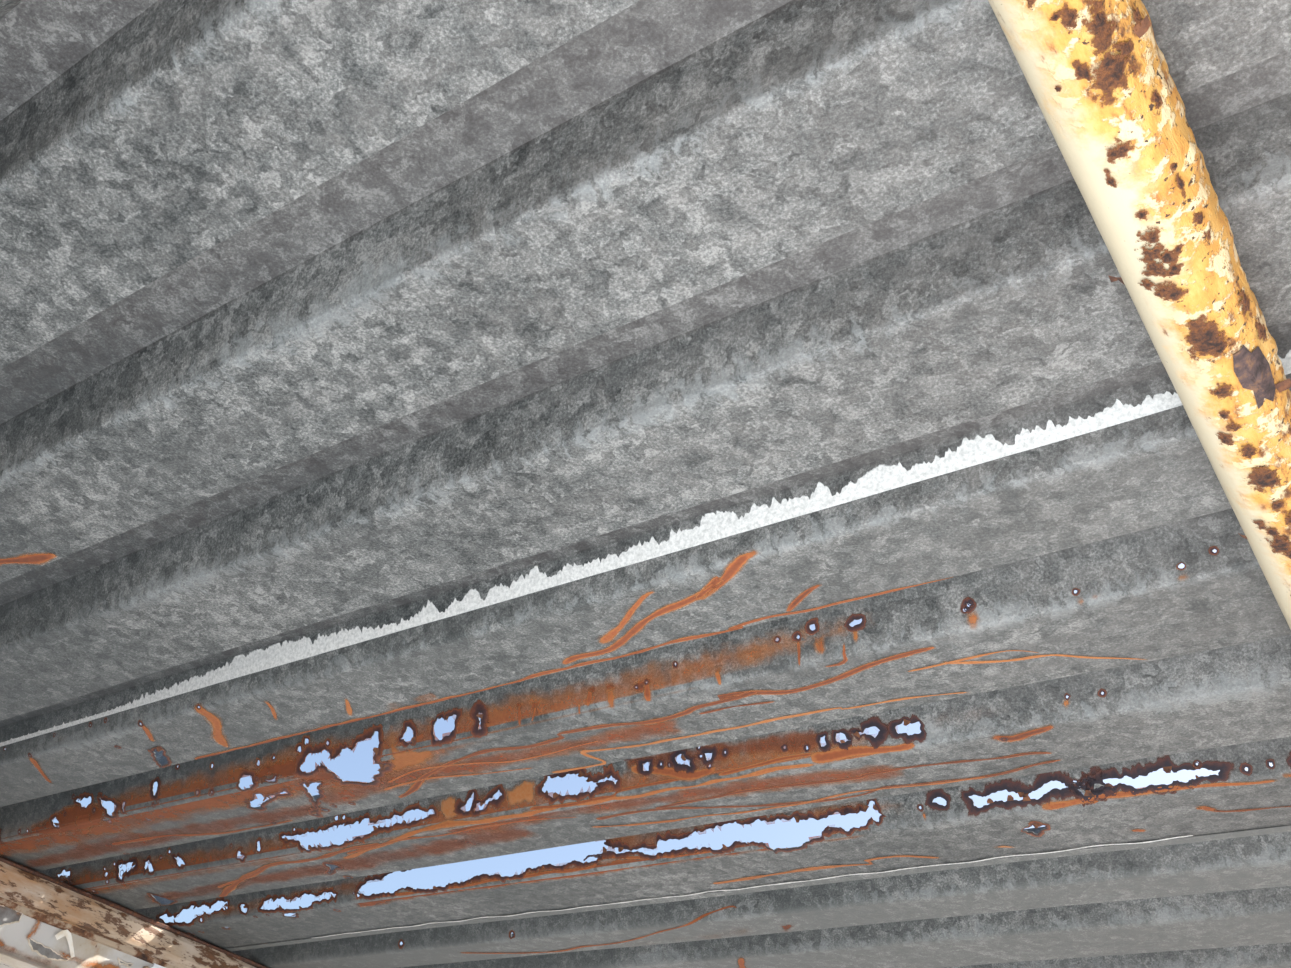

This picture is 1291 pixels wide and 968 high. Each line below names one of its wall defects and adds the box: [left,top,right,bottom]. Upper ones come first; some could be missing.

rust [1049,0,1142,107]
rust [1150,89,1163,115]
rust [1104,138,1135,188]
rust [1170,163,1186,198]
rust [1193,212,1211,244]
rust [1135,210,1189,301]
rust [1184,290,1291,559]
rust [0,551,1147,968]
peeling [987,792,1031,804]
rust [1042,774,1291,810]
peeling [0,905,23,927]
peeling [28,937,70,961]